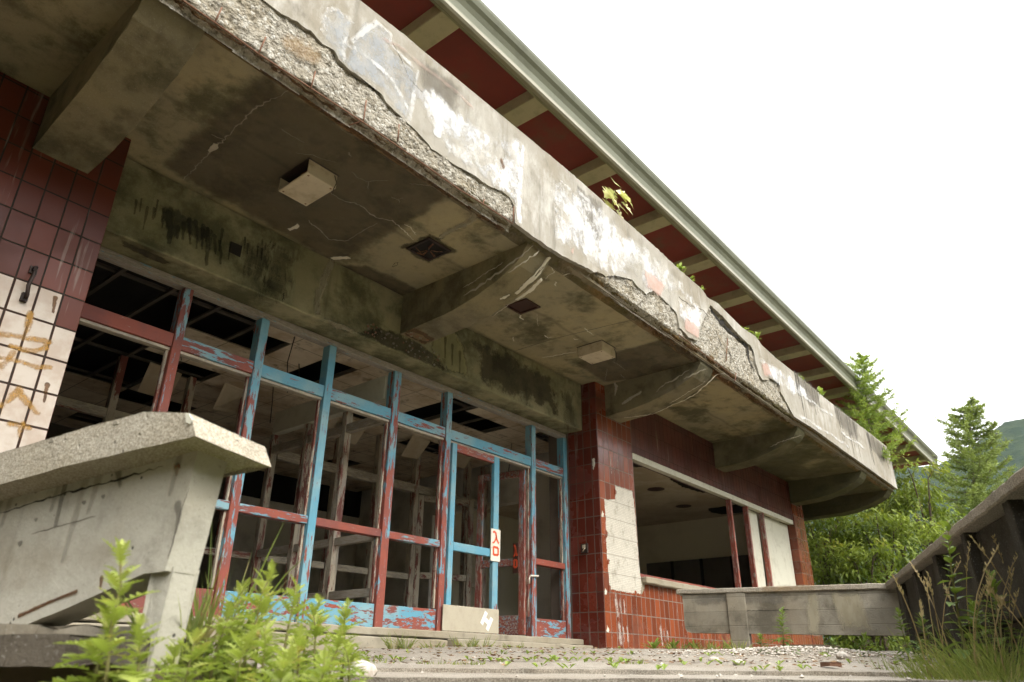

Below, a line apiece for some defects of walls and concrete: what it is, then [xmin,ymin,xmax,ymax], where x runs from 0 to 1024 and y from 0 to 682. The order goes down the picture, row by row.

crack [183,91,287,180]
damp [166,81,443,332]
rust [173,0,509,231]
spalling [159,0,894,491]
rust [632,311,790,423]
peeling [601,485,645,597]